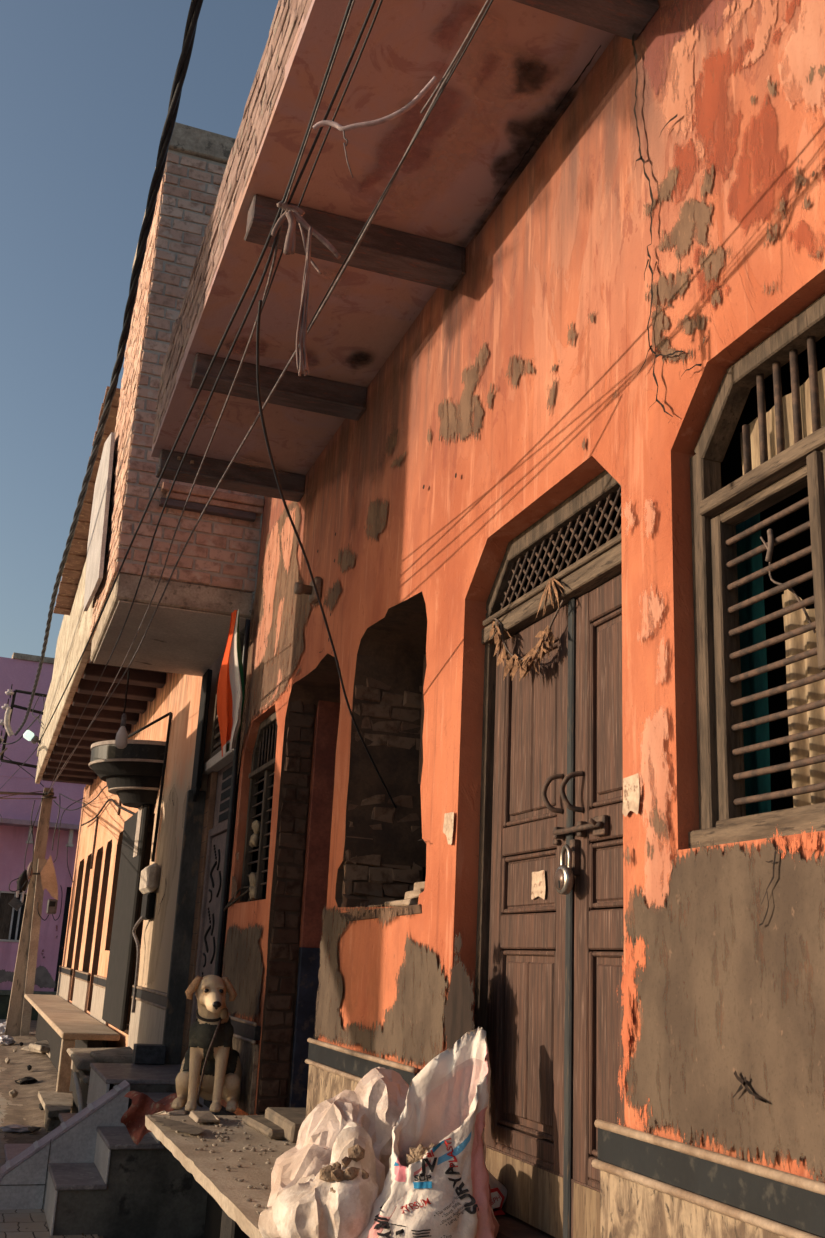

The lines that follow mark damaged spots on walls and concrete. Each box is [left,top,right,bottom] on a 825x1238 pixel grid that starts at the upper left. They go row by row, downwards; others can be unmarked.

crack [568,45,601,92]
crack [632,34,702,422]
peeling [642,0,825,367]
flaking render [427,342,534,445]
flaking render [547,360,560,416]
peeling [622,497,655,538]
flaking render [236,501,355,783]
peeling [637,587,668,684]
flaking render [0,969,14,983]
flaking render [34,949,56,988]
flaking render [314,903,448,1069]
flaking render [620,706,825,1182]